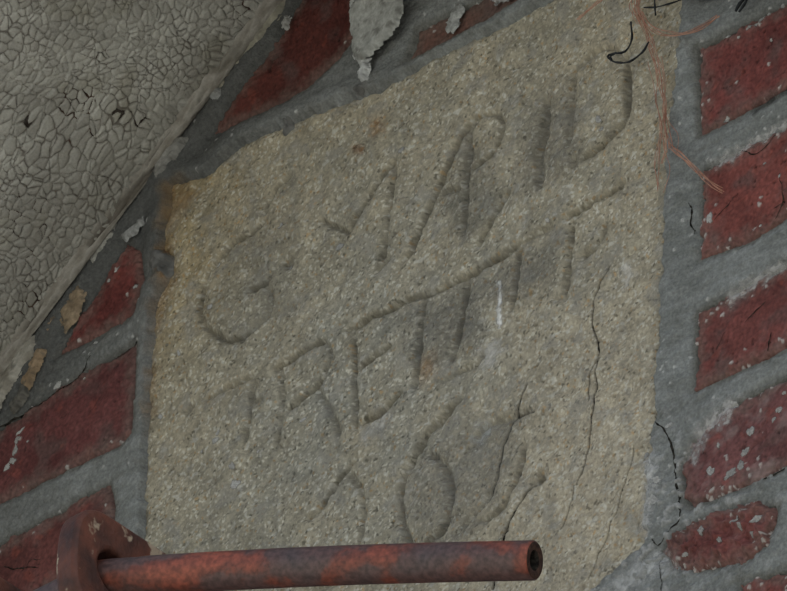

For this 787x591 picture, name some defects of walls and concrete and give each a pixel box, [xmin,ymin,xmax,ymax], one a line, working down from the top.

peeling [349,0,404,82]
crack [0,355,91,427]
crack [493,398,522,494]
crack [650,417,681,589]